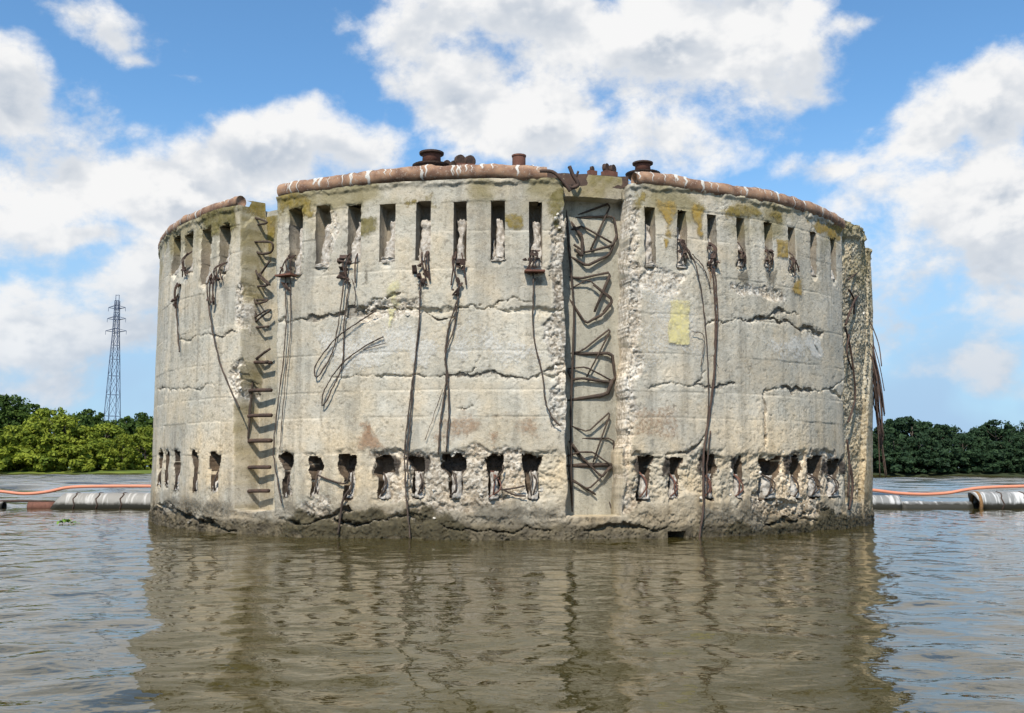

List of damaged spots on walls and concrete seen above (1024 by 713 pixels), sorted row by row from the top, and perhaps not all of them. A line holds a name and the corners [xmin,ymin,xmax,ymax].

crack [303,291,401,322]
crack [444,364,558,380]
spalling [541,212,567,432]
spalling [613,181,687,514]
crack [693,377,736,390]
crack [741,306,824,347]
spalling [699,235,873,529]
spalling [299,470,353,535]
spalling [368,442,543,524]
leakage [475,503,557,522]